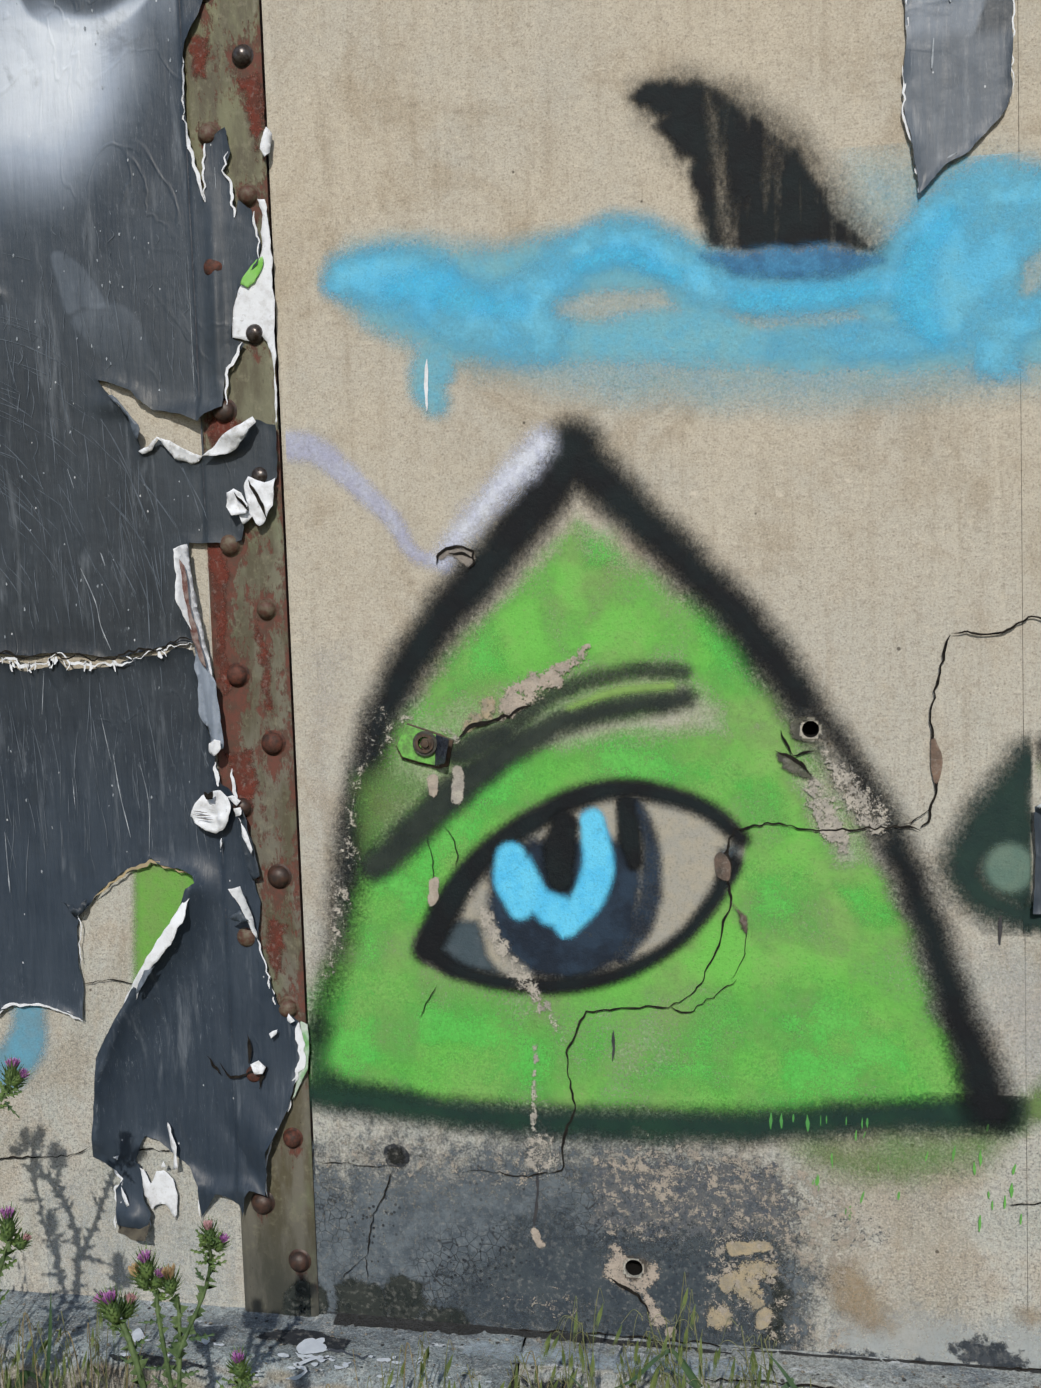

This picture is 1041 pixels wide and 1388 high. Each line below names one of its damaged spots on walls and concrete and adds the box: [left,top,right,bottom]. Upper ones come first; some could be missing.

rust [236,72,265,159]
rust [206,417,241,447]
rust [207,546,232,695]
peeling [441,643,590,744]
crack [929,615,1041,739]
rust [224,749,259,817]
crack [463,781,939,1178]
peeling [323,1126,548,1190]
spalling [531,1228,545,1248]
peeling [586,1133,872,1356]
crack [516,1329,834,1388]
crack [893,1360,1041,1370]